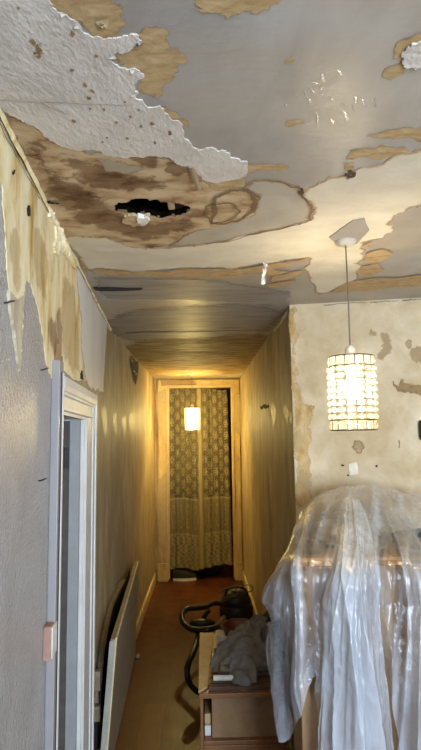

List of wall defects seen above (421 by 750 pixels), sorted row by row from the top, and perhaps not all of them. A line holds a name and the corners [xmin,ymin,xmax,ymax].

peeling [0,0,289,191]
leakage [5,114,313,248]
peeling [0,121,421,393]
flaking render [382,33,421,80]
flaking render [271,307,315,506]
peeling [392,379,421,396]